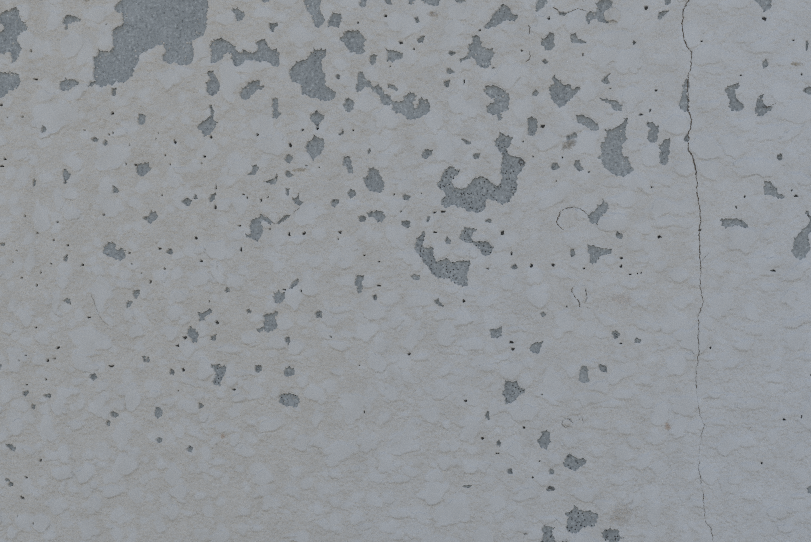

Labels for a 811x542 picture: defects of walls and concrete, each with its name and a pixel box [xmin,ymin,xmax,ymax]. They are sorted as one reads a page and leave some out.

peeling [0,6,28,98]
peeling [89,0,209,96]
peeling [197,36,281,137]
peeling [290,48,336,161]
peeling [304,0,377,65]
peeling [343,70,430,120]
peeling [437,131,526,223]
peeling [576,97,634,177]
peeling [415,231,471,287]
peeling [446,226,494,256]
crack [681,0,713,540]
peeling [538,505,624,542]